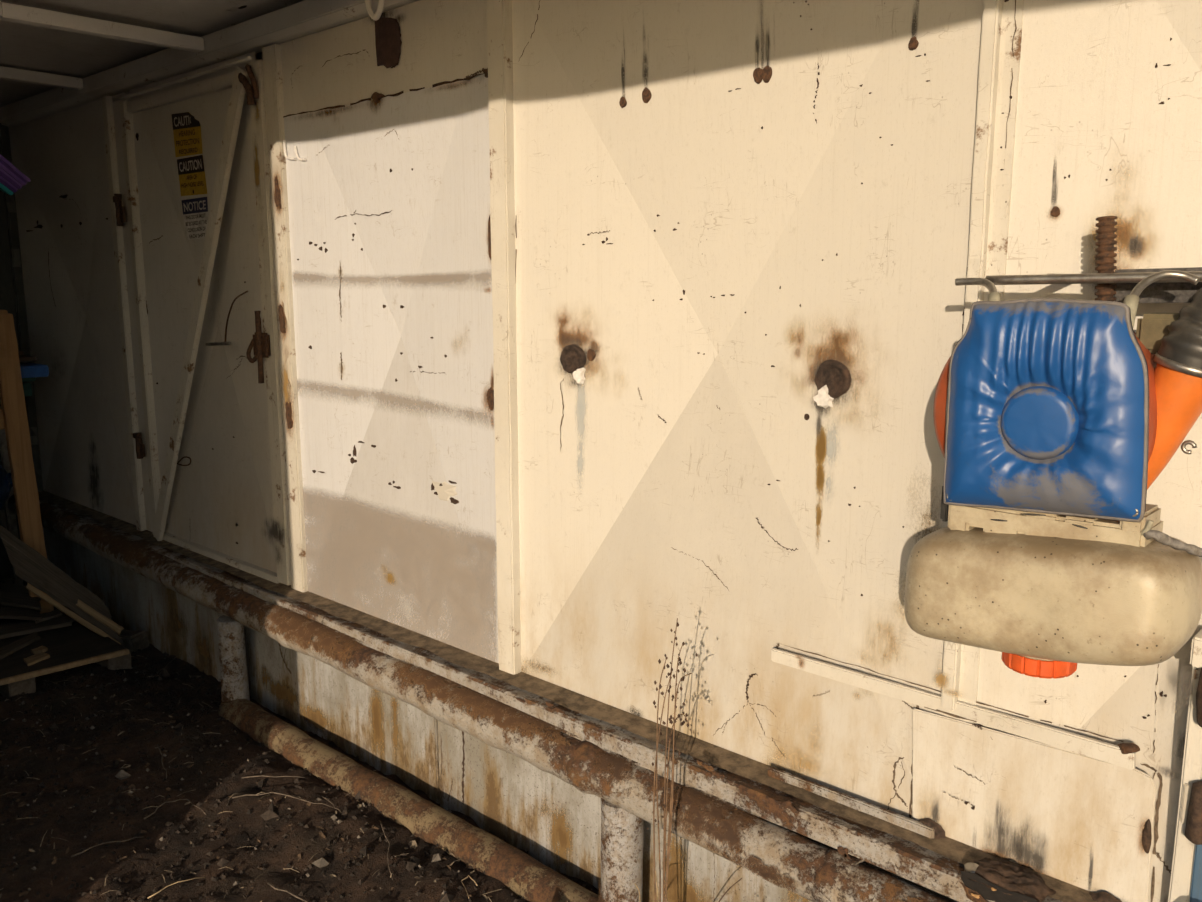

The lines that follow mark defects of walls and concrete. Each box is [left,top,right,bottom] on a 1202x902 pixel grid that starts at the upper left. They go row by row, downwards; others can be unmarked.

crack [283,49,488,139]
corrosion [558,315,598,472]
corrosion [791,329,851,539]
corrosion [257,604,364,662]
corrosion [391,659,578,746]
crack [715,673,784,756]
crack [776,643,1171,902]
corrosion [1117,743,1140,754]
corrosion [660,785,808,902]
corrosion [918,805,946,839]
corrosion [1140,819,1152,854]
corrosion [1089,891,1122,902]